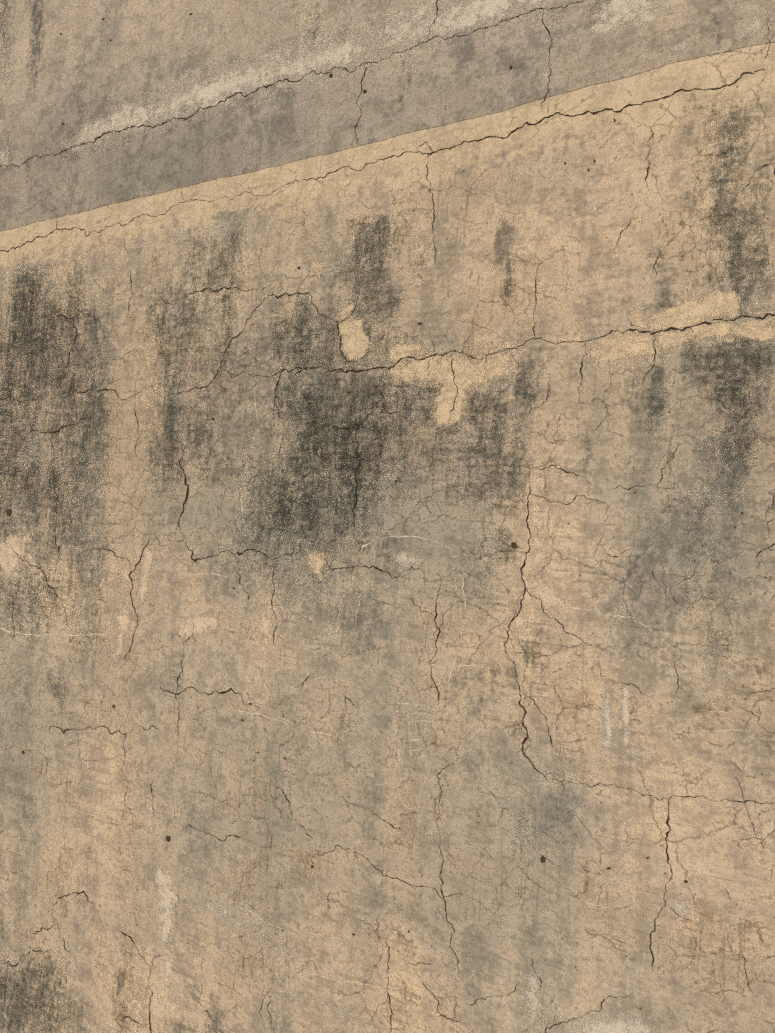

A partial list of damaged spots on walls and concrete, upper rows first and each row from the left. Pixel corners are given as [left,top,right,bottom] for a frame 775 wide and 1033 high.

leakage [67,0,575,151]
crack [0,1,774,264]
leakage [585,0,663,40]
crack [22,312,143,455]
crack [161,255,775,538]
crack [99,439,441,703]
efflorescence [392,551,423,568]
crack [49,624,244,819]
crack [485,446,775,973]
crack [4,877,96,967]
crack [114,928,159,1033]
crack [267,764,542,1033]